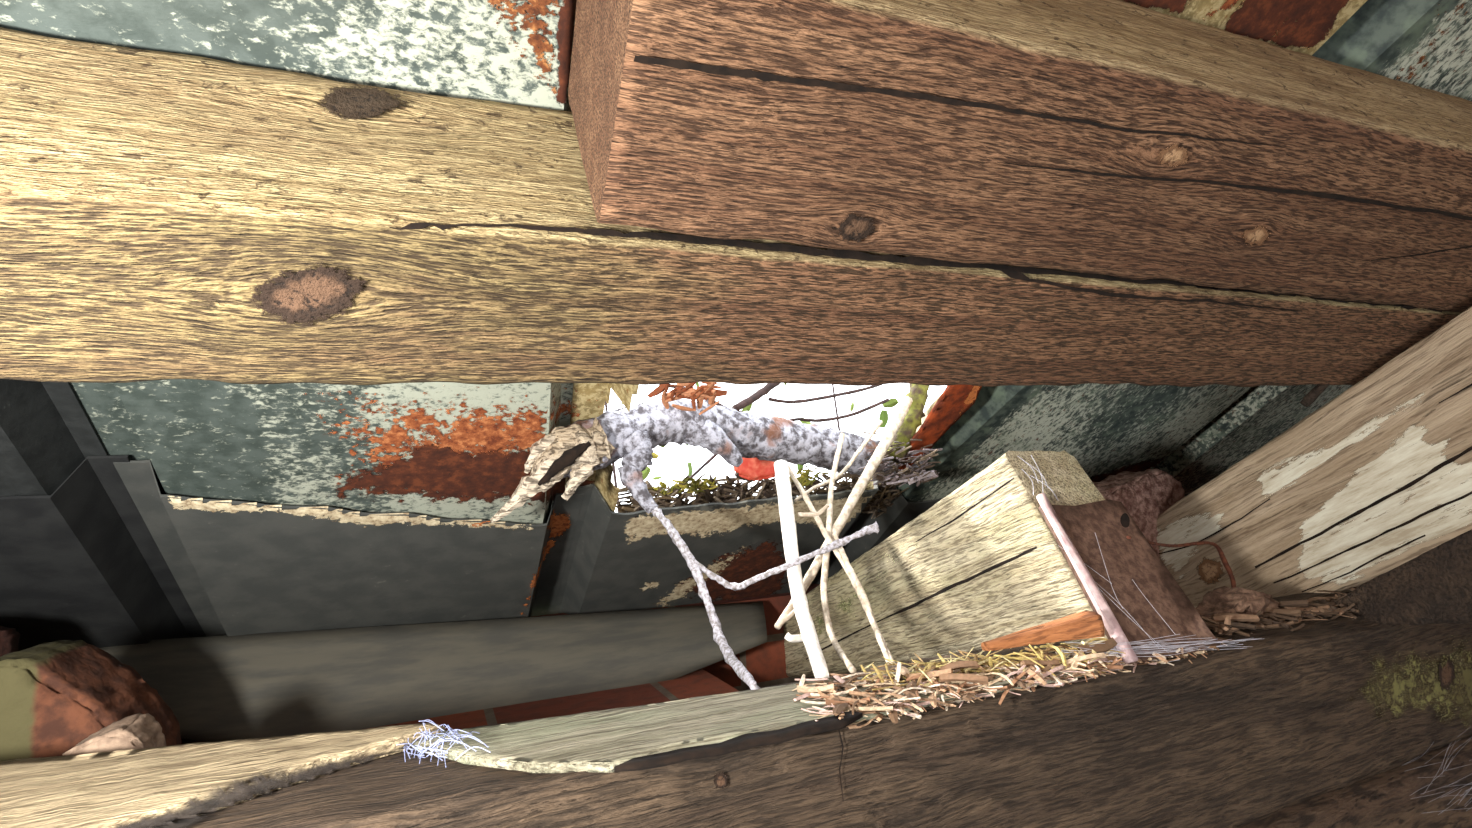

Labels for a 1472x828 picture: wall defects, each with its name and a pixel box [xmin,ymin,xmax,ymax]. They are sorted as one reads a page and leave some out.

corrosion [487,0,577,104]
corrosion [1124,0,1190,15]
corrosion [1203,0,1350,49]
crack [634,55,1271,146]
crack [389,223,1442,312]
corrosion [319,387,598,615]
peeling [1156,512,1224,579]
peeling [1256,393,1472,586]